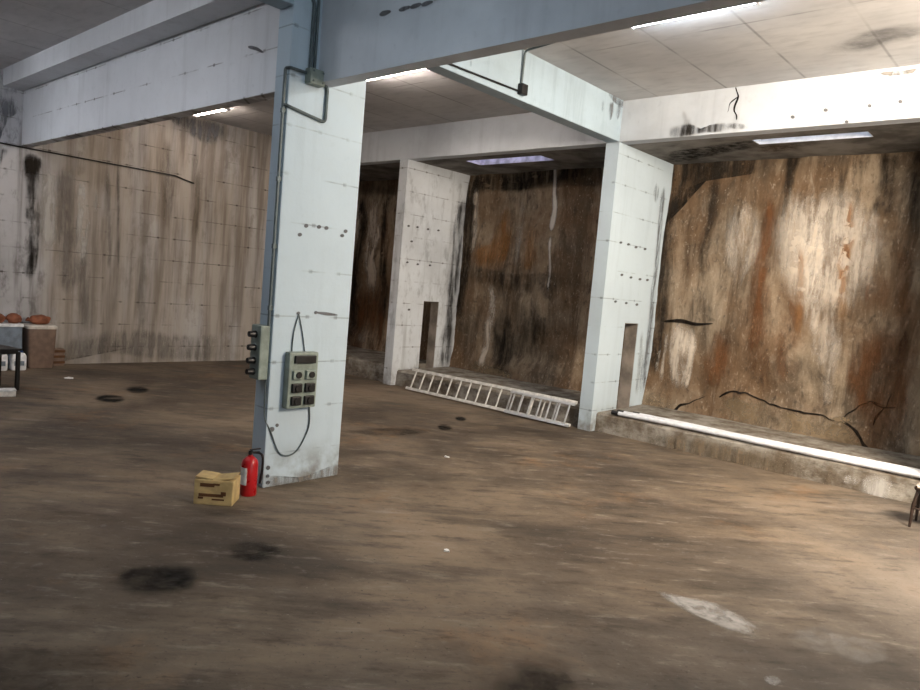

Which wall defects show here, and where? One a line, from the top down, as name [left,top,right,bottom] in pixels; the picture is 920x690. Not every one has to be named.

damp [0,100,15,136]
crack [728,87,739,120]
damp [25,155,86,283]
damp [351,201,387,333]
rust [750,205,775,348]
rust [840,208,851,288]
crack [664,318,713,326]
crack [674,390,895,448]